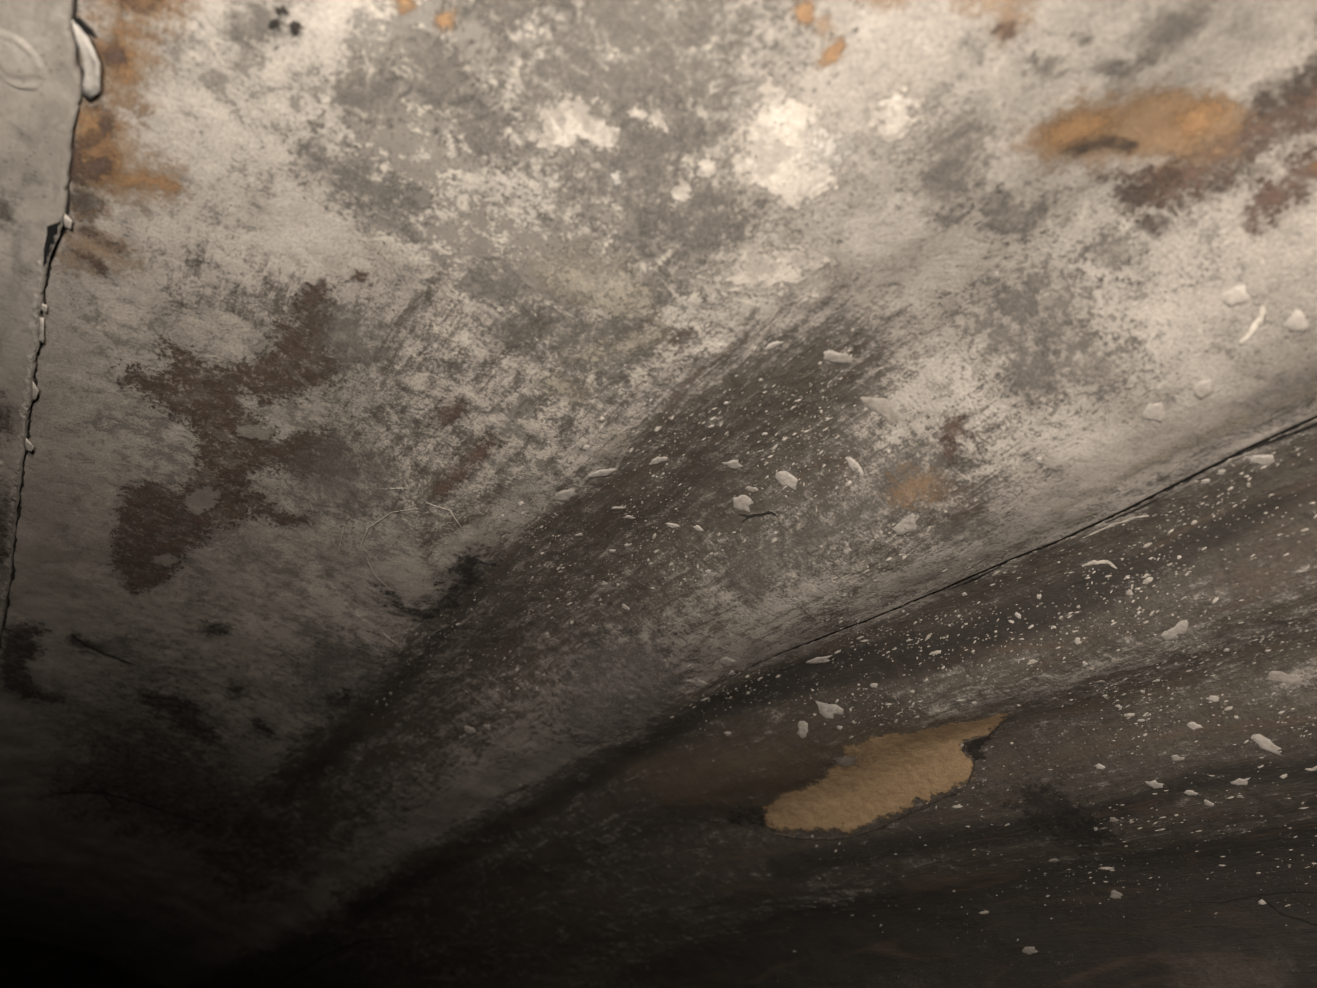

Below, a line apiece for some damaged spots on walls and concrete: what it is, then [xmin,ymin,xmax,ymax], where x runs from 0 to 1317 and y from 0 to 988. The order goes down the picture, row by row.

damp [207,0,304,62]
corrosion [56,0,184,278]
damp [280,0,875,360]
corrosion [1021,87,1248,189]
corrosion [1241,147,1317,235]
crack [0,0,84,647]
damp [367,544,496,622]
crack [708,416,1317,688]
crack [70,633,165,699]
peeling [729,700,1021,840]